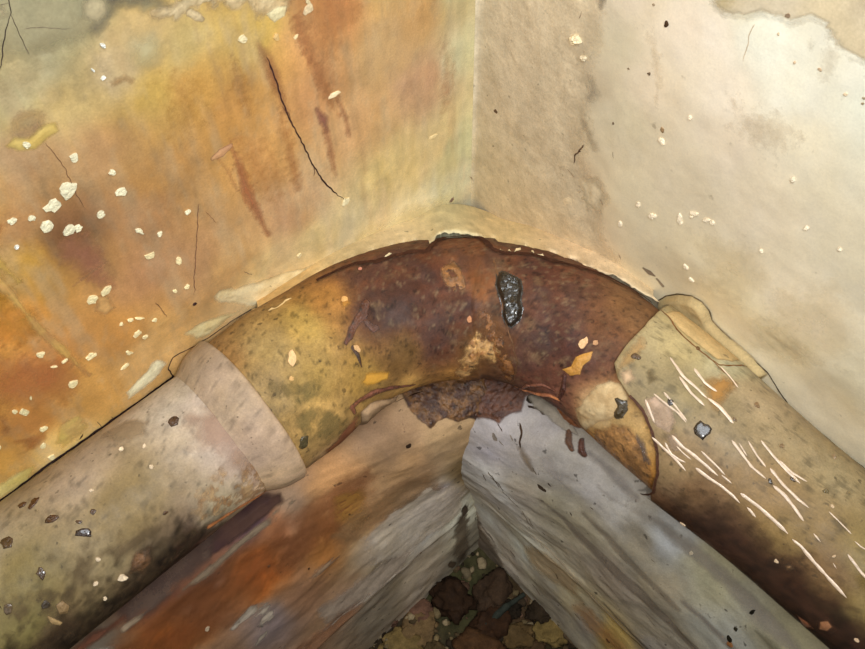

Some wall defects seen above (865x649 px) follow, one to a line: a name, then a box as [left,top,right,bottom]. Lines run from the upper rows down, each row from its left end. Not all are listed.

crack [0,0,70,68]
peeling [303,0,313,15]
peeling [716,0,865,59]
water stain [8,114,58,150]
crack [266,57,344,199]
water stain [28,182,83,236]
water stain [87,285,113,315]
water stain [119,317,157,340]
water stain [39,426,55,460]
rust [74,476,434,649]